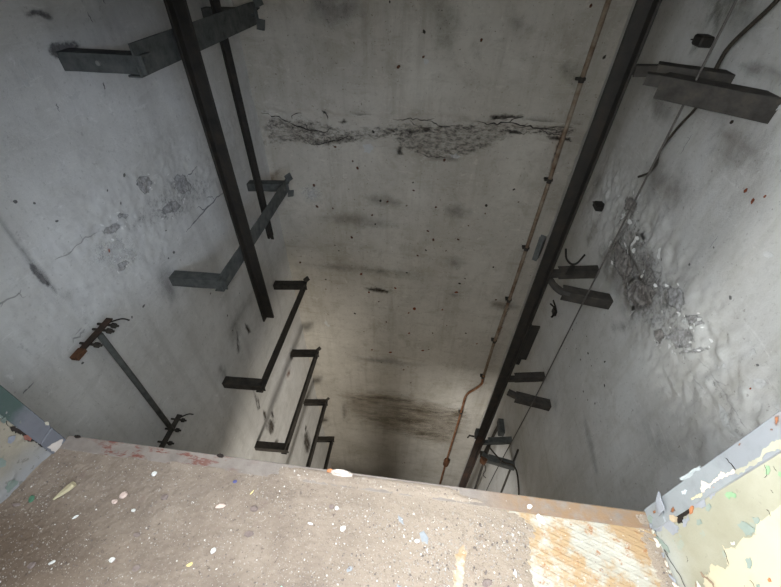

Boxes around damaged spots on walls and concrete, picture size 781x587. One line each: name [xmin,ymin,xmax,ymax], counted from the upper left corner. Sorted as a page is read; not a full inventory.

crack [263,111,352,145]
crack [394,118,457,127]
crack [478,117,571,141]
spalling [136,174,155,194]
spalling [162,174,192,220]
spalling [100,202,128,241]
peeling [695,505,781,587]